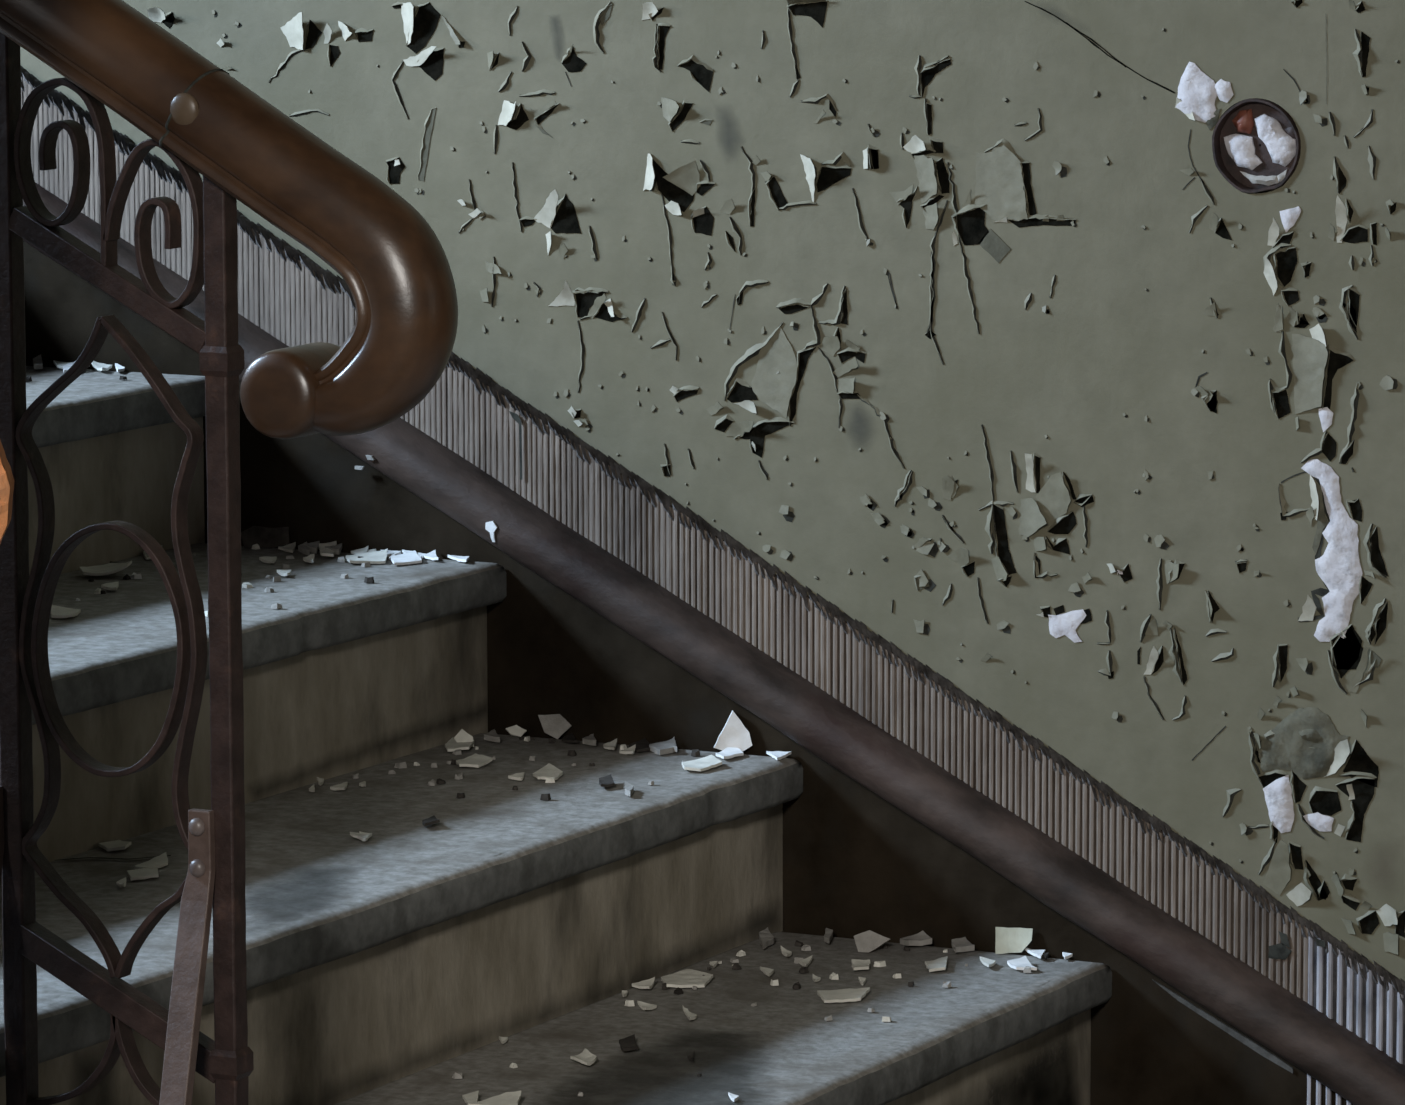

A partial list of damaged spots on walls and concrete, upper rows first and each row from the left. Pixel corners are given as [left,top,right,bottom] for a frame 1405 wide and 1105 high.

peeling [269,12,373,83]
peeling [386,2,465,195]
peeling [479,6,587,154]
peeling [512,162,597,260]
peeling [643,97,743,285]
peeling [761,124,880,210]
peeling [890,55,1077,334]
flaking render [1175,61,1234,130]
peeling [706,283,867,480]
peeling [942,424,1094,643]
flaking render [1246,156,1405,959]
peeling [682,710,752,771]